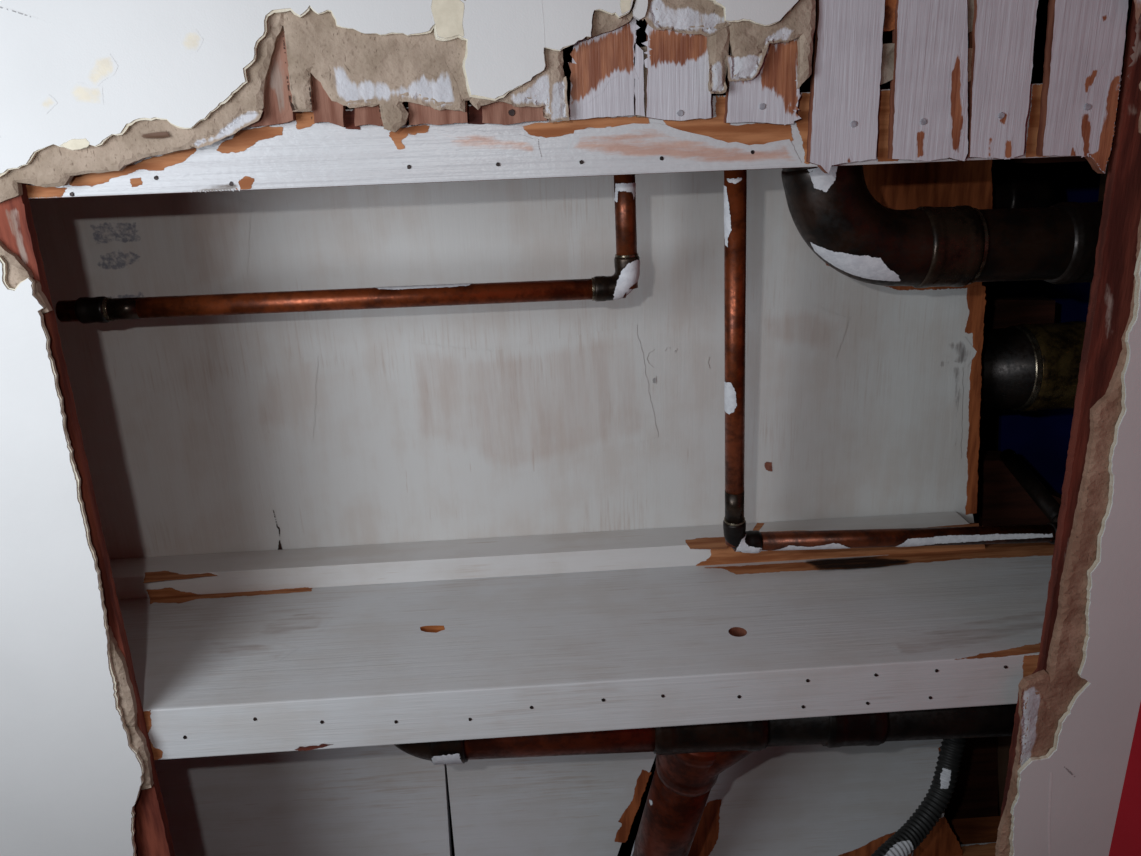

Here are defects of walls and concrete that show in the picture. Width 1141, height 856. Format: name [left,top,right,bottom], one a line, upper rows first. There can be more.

flaking render [0,0,816,203]
peeling [844,44,1046,210]
peeling [1069,61,1122,173]
flaking render [0,241,53,313]
peeling [174,176,254,295]
peeling [143,571,312,604]
flaking render [685,278,1136,856]
flaking render [108,625,163,790]
peeling [615,770,651,843]